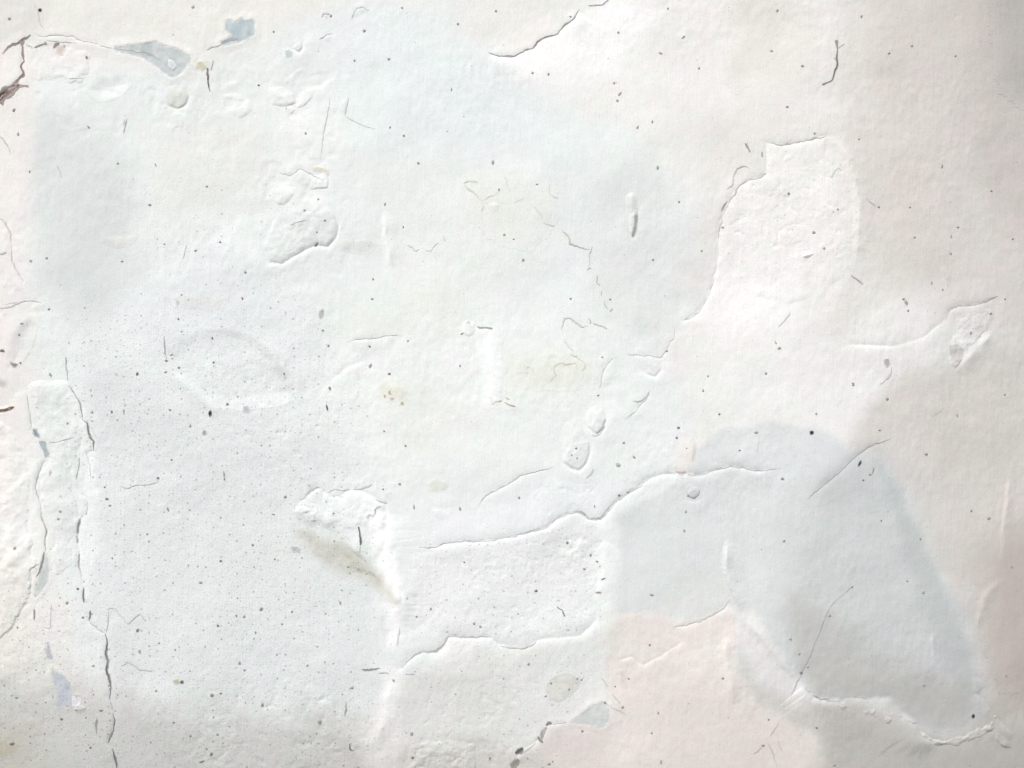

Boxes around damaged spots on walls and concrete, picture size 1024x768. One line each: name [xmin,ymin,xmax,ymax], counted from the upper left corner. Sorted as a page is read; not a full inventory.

crack [0,6,111,105]
peeling [104,10,262,86]
flaking render [291,471,397,515]
crack [6,356,158,768]
crack [768,681,941,768]
water stain [801,651,980,734]